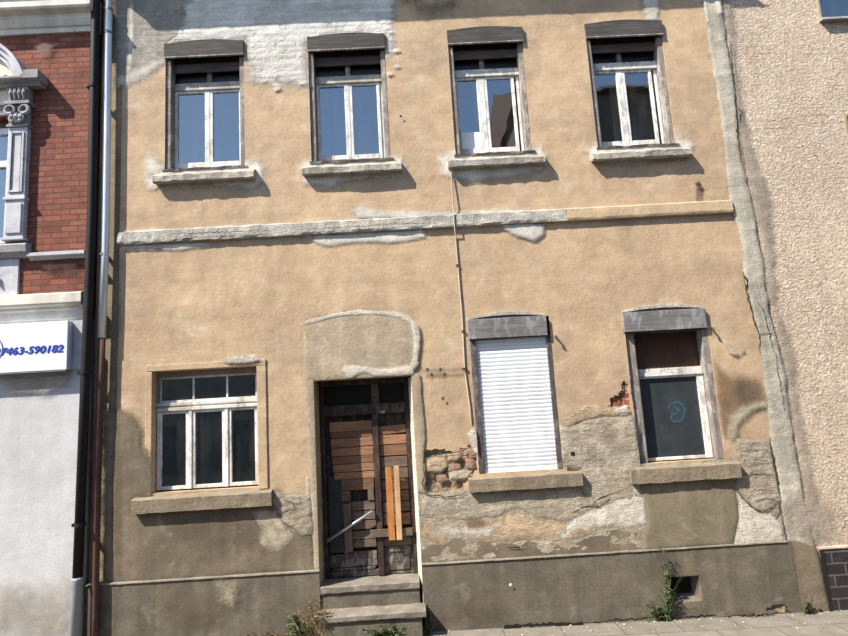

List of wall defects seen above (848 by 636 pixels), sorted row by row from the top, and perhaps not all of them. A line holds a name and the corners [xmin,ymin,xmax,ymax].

crack [743,272,785,409]
damp [100,408,314,601]
flaking render [273,491,313,536]
flaking render [418,381,738,563]
crack [573,490,621,513]
crack [736,437,787,541]
peeling [760,503,787,540]